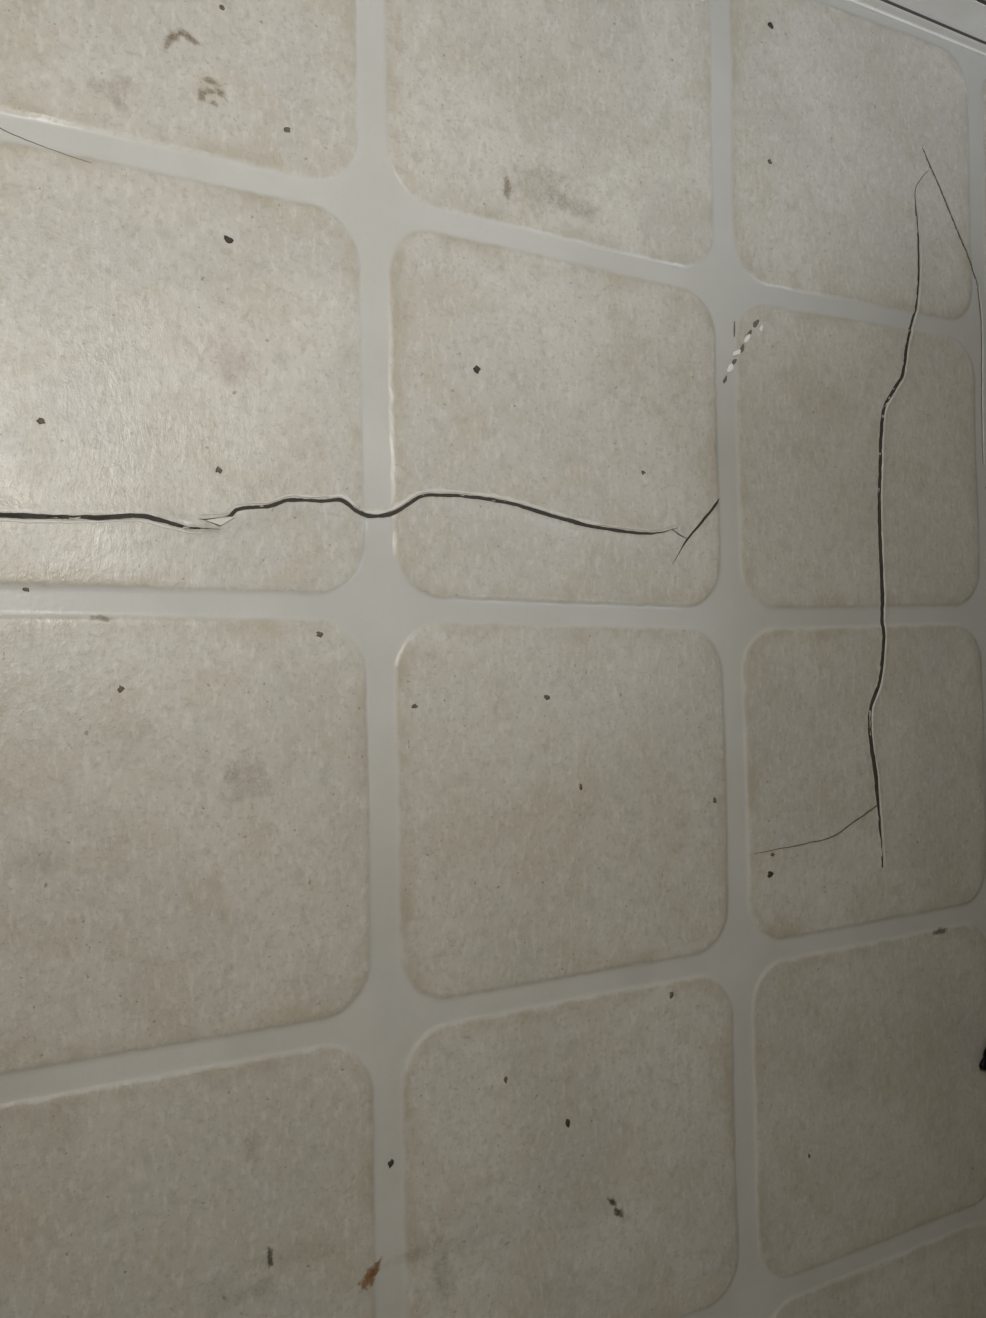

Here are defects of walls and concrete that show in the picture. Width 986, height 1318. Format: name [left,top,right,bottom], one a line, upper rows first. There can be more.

crack [0,488,719,563]
crack [755,148,985,868]